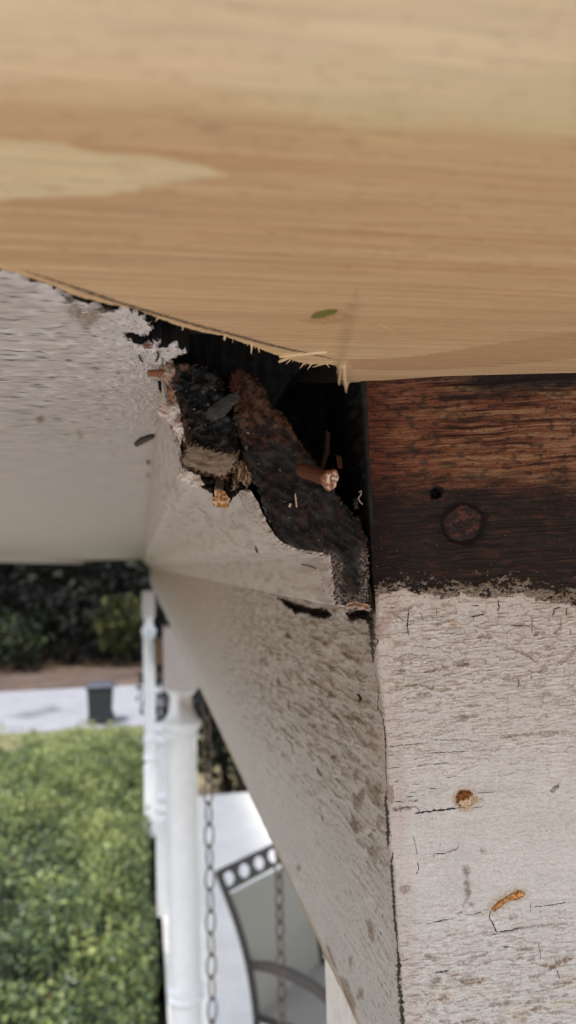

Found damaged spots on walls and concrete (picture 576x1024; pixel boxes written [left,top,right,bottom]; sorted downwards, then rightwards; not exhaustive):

peeling [156,366,186,446]
peeling [176,470,205,488]
crack [357,584,571,1024]
corrosion [456,790,474,808]
corrosion [493,891,525,911]